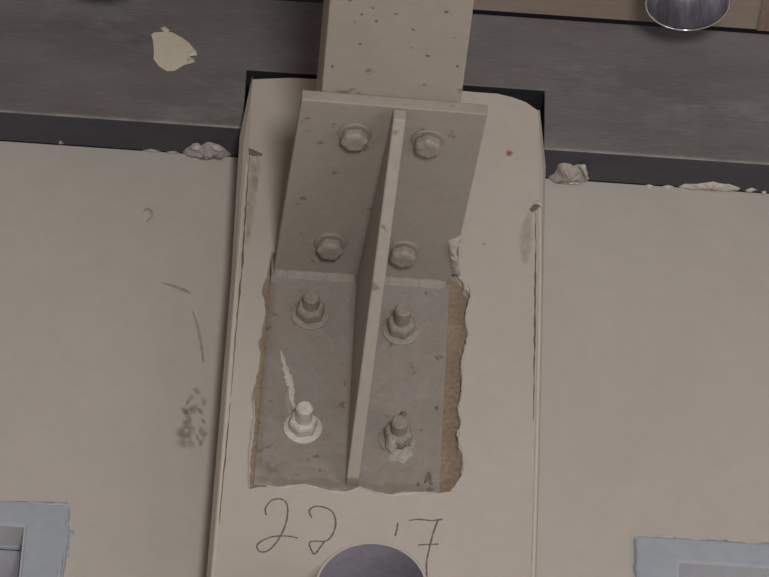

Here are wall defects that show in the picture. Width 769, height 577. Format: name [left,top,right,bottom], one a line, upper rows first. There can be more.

peeling [151,26,197,71]
peeling [645,182,767,195]
spalling [248,235,473,497]